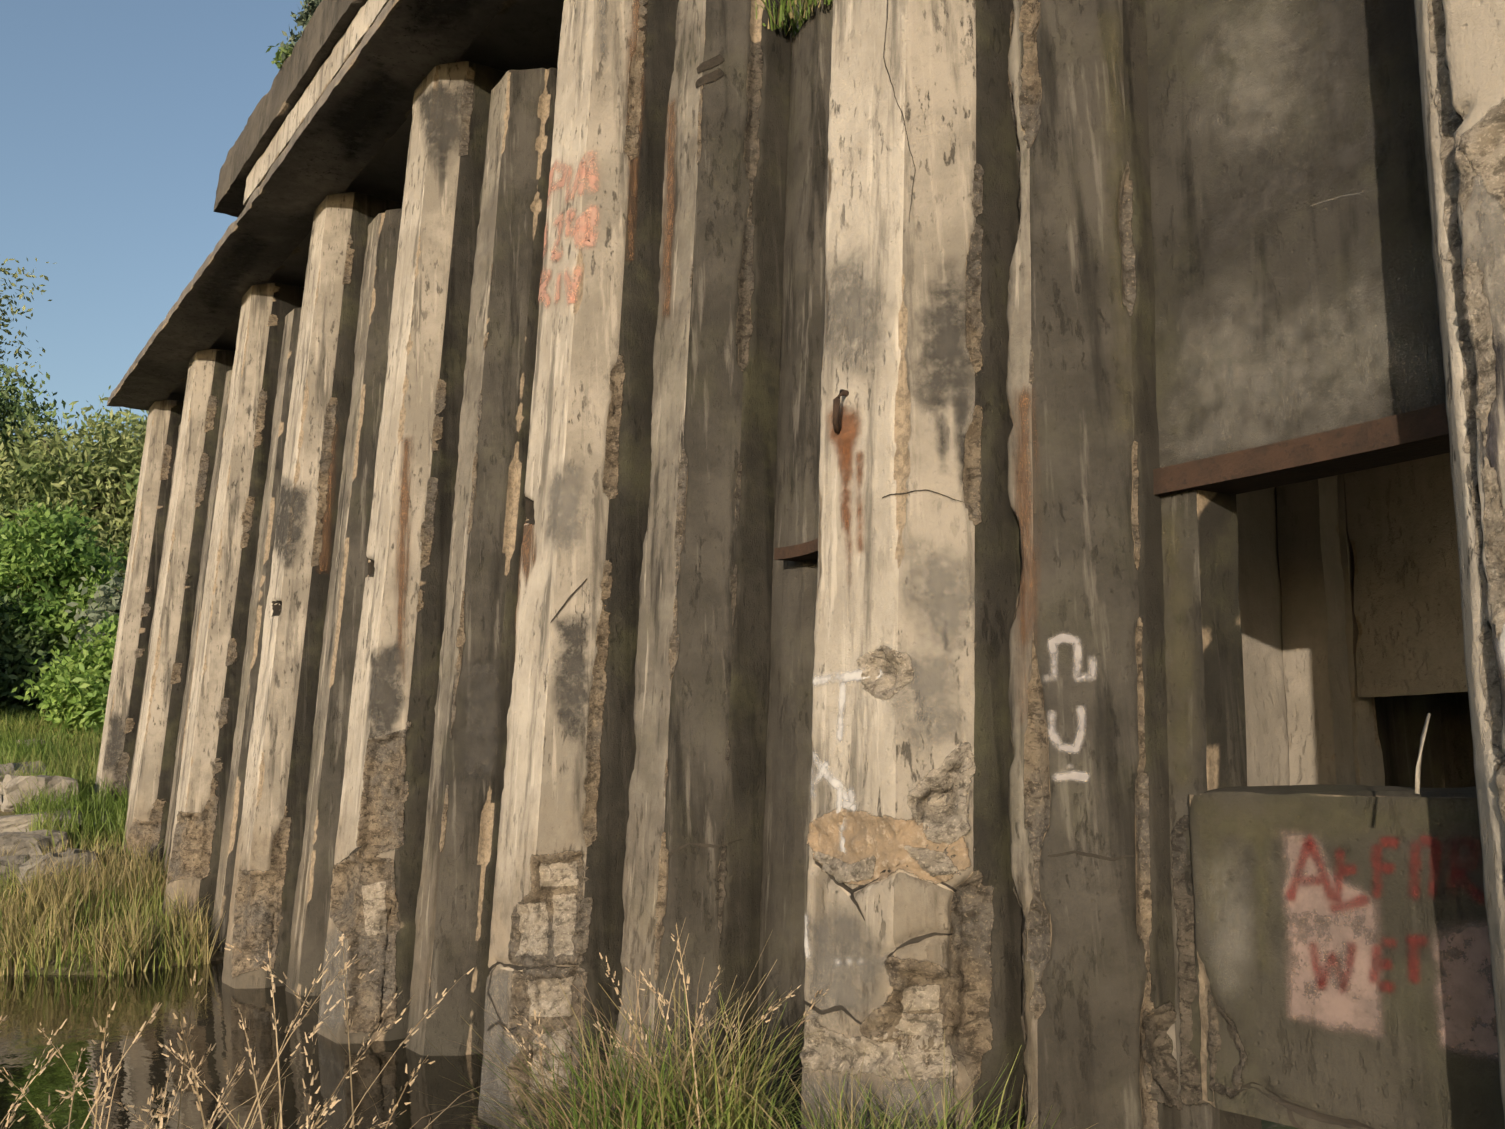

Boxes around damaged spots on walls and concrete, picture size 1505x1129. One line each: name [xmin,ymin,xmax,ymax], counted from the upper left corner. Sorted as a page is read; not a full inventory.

crack [883,0,916,216]
spalling [311,397,338,567]
spalling [602,354,626,500]
corrosion [830,407,862,550]
water stain [827,264,879,366]
water stain [917,283,975,480]
spalling [1428,0,1505,825]
spalling [856,646,914,700]
spalling [231,804,292,978]
spalling [330,720,413,1033]
spalling [506,560,613,1118]
spalling [800,742,994,1087]